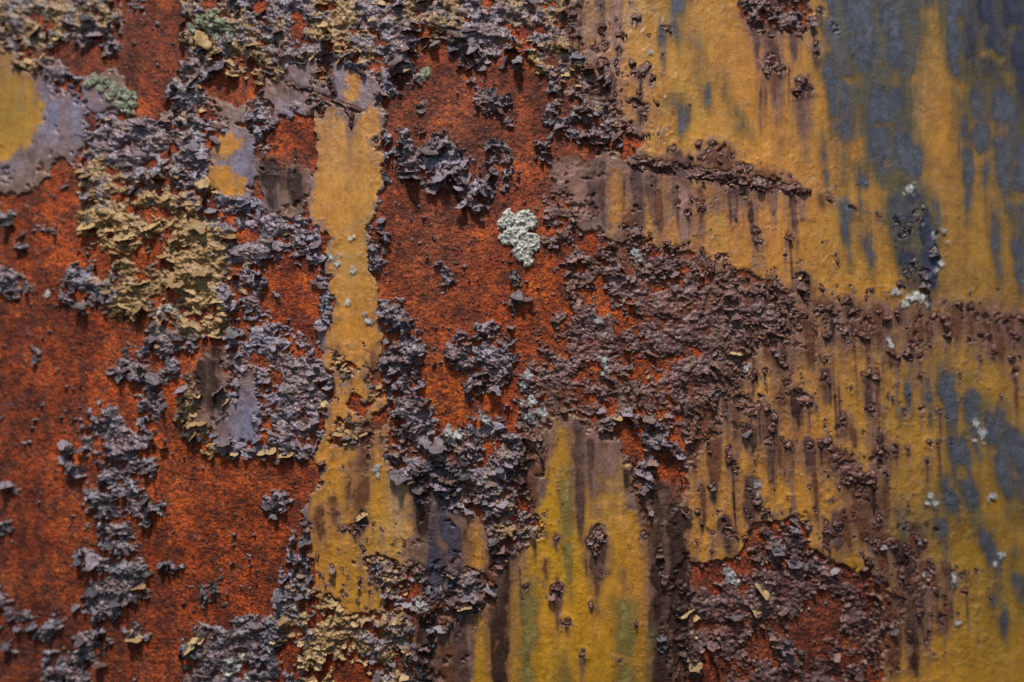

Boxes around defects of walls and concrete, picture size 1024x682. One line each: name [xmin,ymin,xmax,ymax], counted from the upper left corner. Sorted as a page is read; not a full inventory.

rust [552,0,668,151]
rust [747,6,841,136]
rust [259,156,305,211]
rust [552,148,776,265]
peeling [0,0,813,682]
rust [314,412,384,539]
leakage [413,459,470,608]
leakage [520,596,537,682]
leakage [560,479,572,580]
peeling [670,495,911,682]
leakage [897,367,1024,602]
leakage [989,594,1009,638]